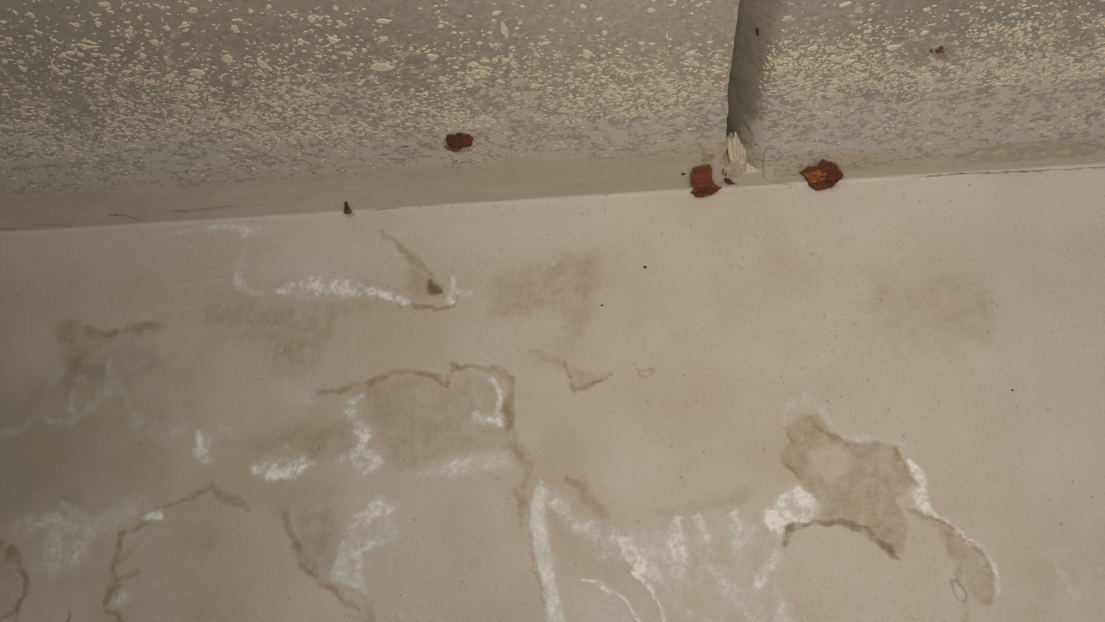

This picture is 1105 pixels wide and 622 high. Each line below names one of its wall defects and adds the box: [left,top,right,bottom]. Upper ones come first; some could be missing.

peeling [0,0,728,195]
corrosion [444,132,474,152]
corrosion [690,164,722,198]
corrosion [799,159,844,191]
water stain [234,265,411,306]
water stain [249,456,316,482]
water stain [339,393,384,475]
water stain [472,376,506,427]
water stain [329,498,398,594]
water stain [529,478,792,622]
water stain [728,485,818,591]
water stain [907,458,1000,594]